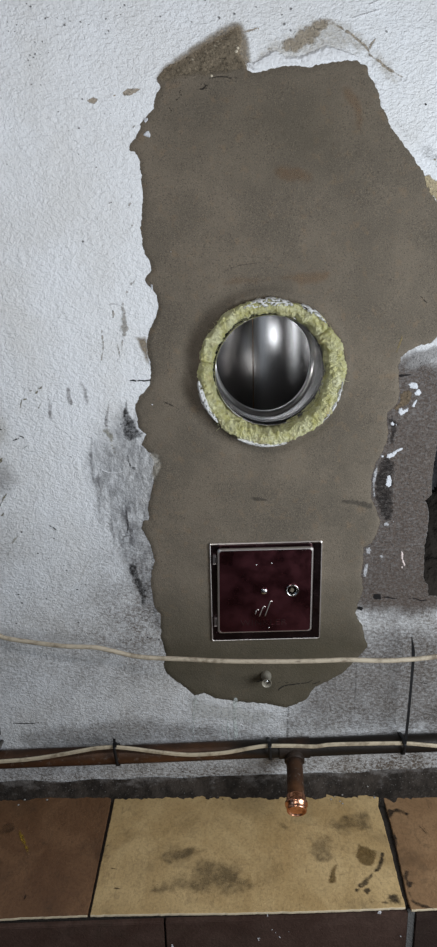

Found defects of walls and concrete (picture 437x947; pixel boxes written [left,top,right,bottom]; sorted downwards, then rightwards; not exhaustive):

peeling [246,8,402,77]
peeling [425,175,437,201]
water stain [120,410,140,440]